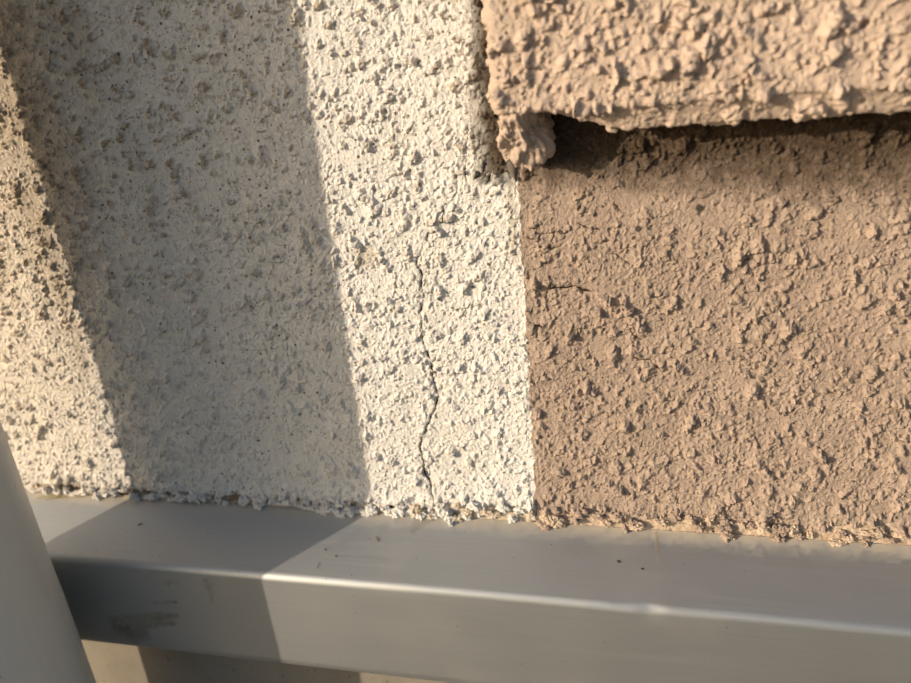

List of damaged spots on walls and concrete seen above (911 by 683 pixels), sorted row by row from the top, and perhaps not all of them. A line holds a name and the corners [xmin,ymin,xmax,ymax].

crack [401,129,492,507]